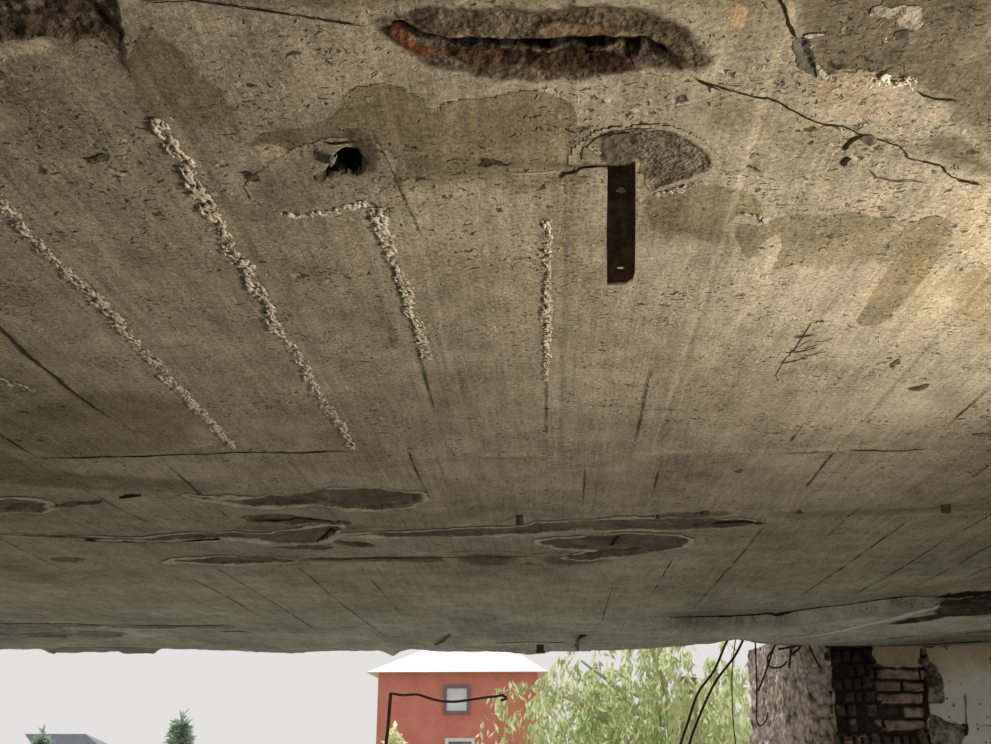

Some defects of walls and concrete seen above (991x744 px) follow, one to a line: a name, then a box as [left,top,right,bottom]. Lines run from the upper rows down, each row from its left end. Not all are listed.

spalling [0,0,124,55]
spalling [378,5,712,82]
peeling [315,150,339,183]
crack [513,128,657,179]
crack [688,69,989,185]
damp [636,180,991,391]
peeling [0,487,764,567]
flaking render [824,646,969,744]